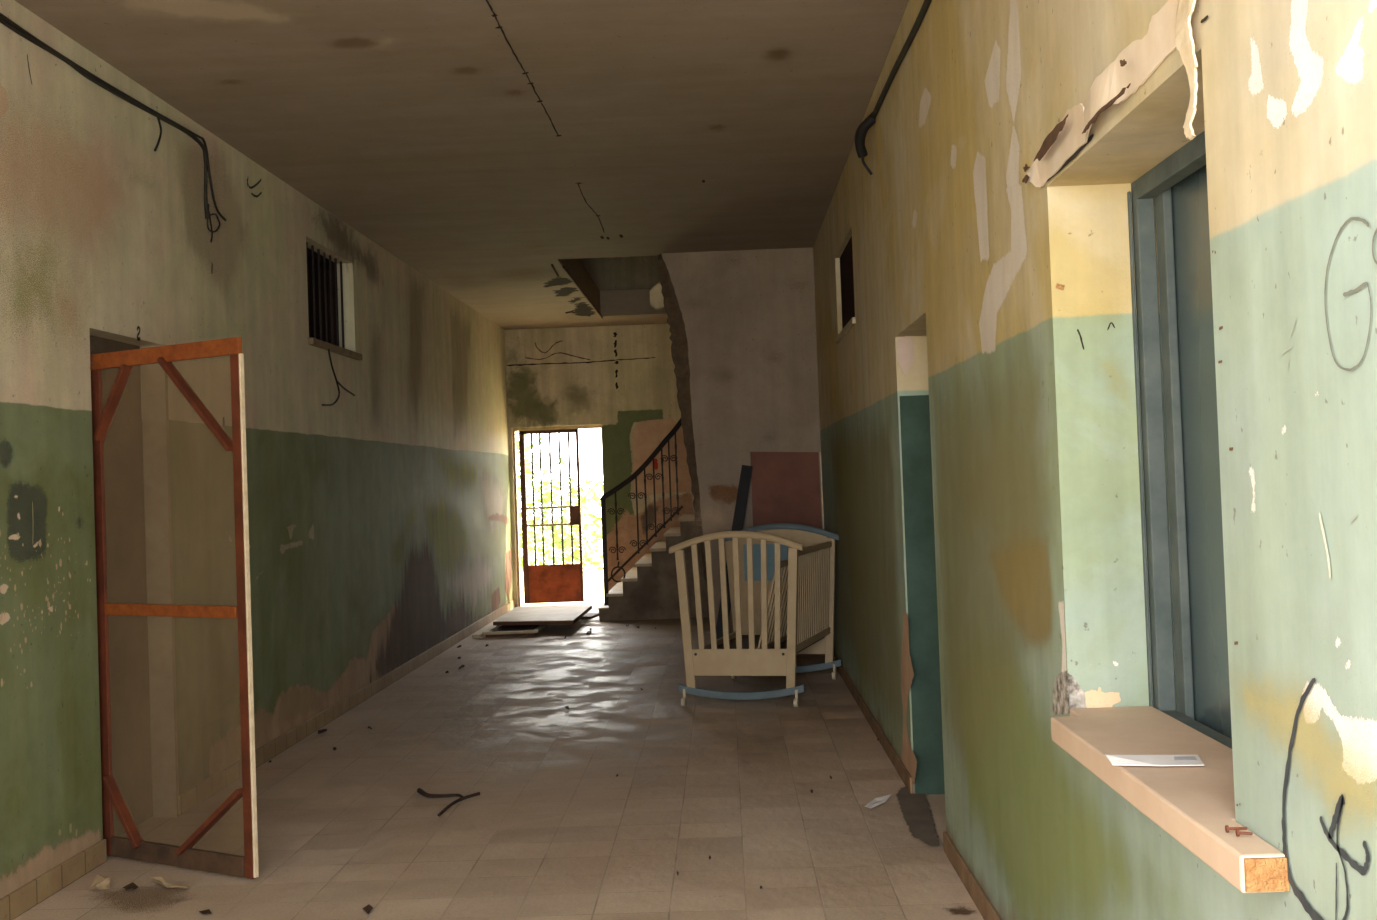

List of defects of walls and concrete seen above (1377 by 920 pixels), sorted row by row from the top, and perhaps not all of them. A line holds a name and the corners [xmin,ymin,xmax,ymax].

crack [486,0,559,136]
peeling [1248,0,1377,130]
peeling [973,0,1198,354]
spalling [543,264,603,319]
leakage [369,304,508,683]
peeling [0,496,91,689]
spalling [1052,601,1121,716]
peeling [1302,680,1377,784]
peeling [0,828,101,899]